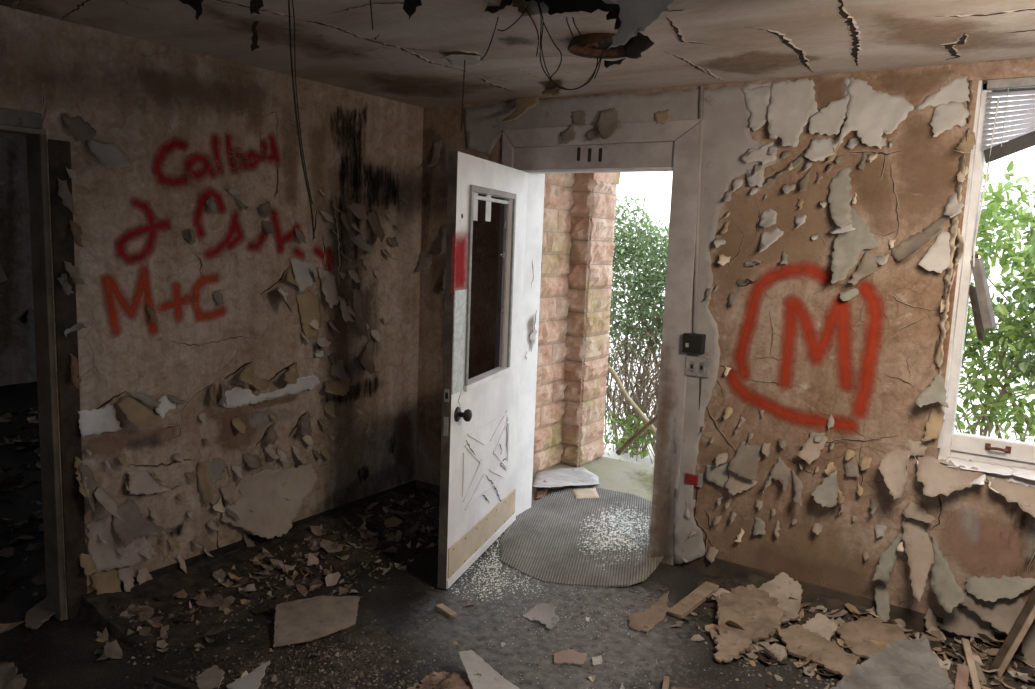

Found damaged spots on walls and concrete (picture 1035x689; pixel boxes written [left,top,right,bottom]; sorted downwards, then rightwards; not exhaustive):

crack [664,8,724,81]
crack [744,27,813,72]
crack [836,0,862,66]
crack [935,7,1035,60]
peeling [57,167,84,248]
leakage [312,107,399,366]
peeling [57,261,88,295]
peeling [464,76,1035,660]
peeling [74,189,403,621]
peeling [739,640,785,666]
peeling [993,619,1035,682]